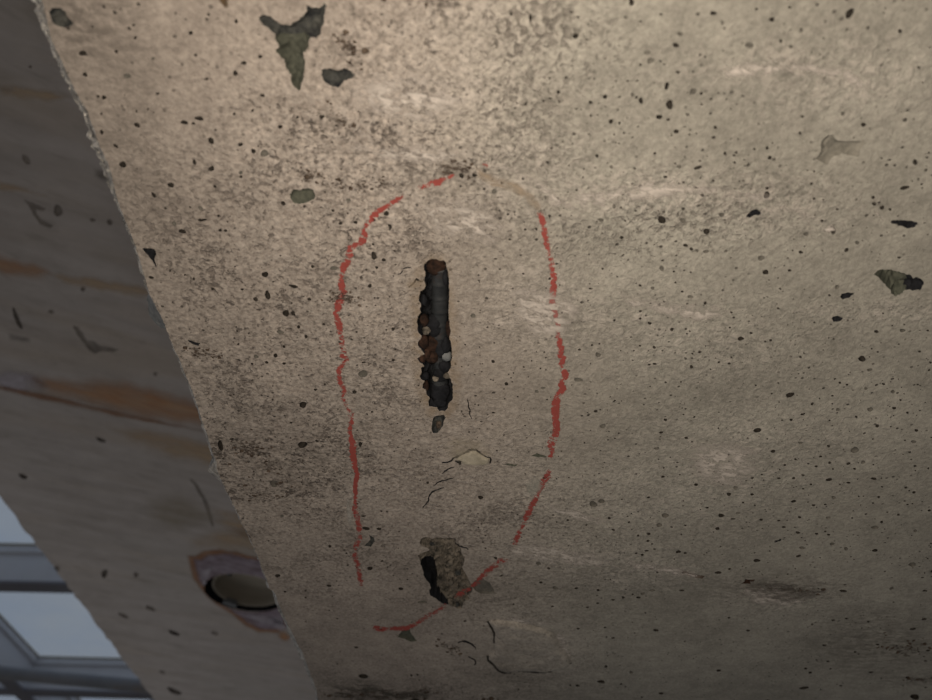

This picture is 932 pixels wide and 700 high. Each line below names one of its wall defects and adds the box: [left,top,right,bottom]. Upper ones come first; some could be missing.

spalling [383,253,551,467]
spalling [418,513,503,631]